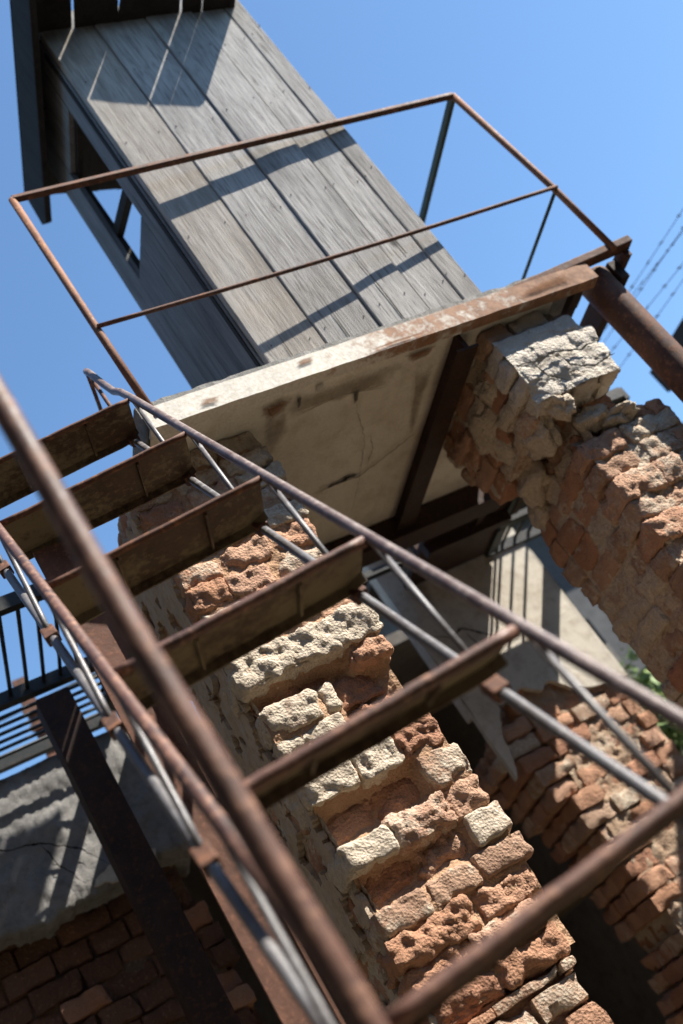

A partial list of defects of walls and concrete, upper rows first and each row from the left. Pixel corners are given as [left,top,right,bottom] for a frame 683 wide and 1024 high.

crack [313,403,412,508]
crack [0,842,109,883]